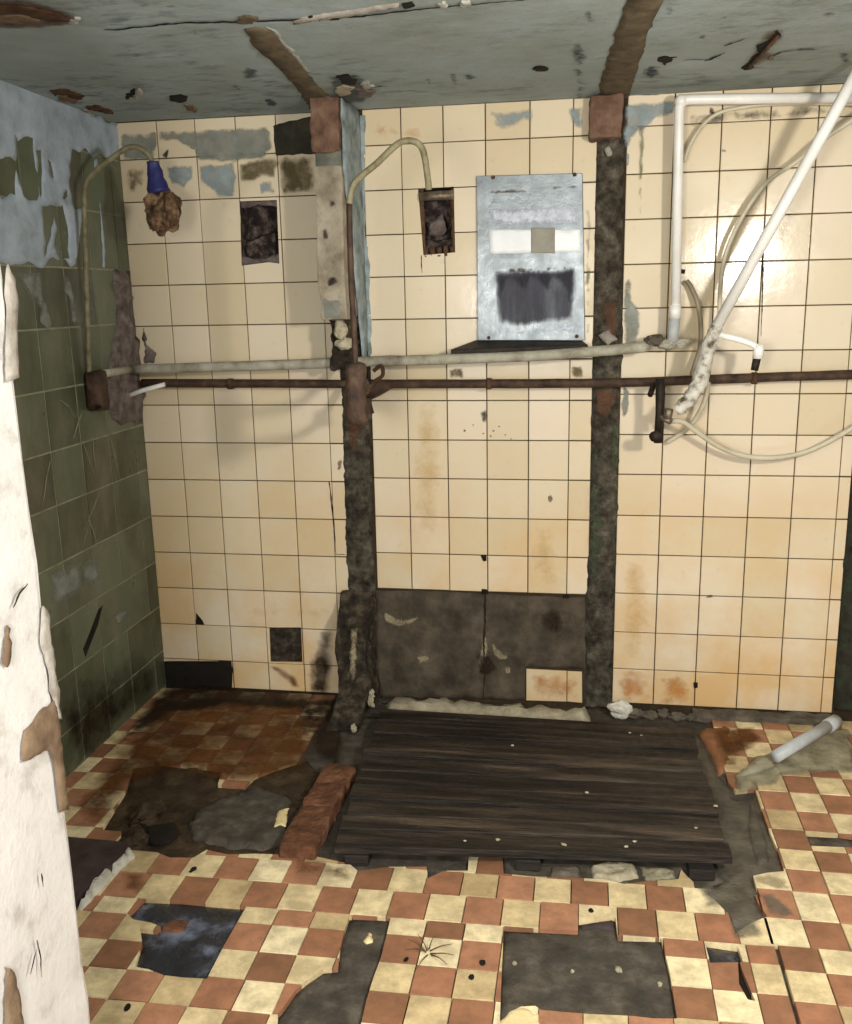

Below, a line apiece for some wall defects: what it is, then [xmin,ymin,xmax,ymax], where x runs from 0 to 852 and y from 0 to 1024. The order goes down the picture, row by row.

peeling [236,15,312,73]
crack [104,0,523,31]
peeling [0,80,277,383]
peeling [2,625,12,667]
peeling [270,627,302,662]
peeling [22,606,69,812]
leakage [82,637,340,813]
peeling [4,967,24,1024]
peeling [131,903,244,979]
peeling [500,908,676,1023]